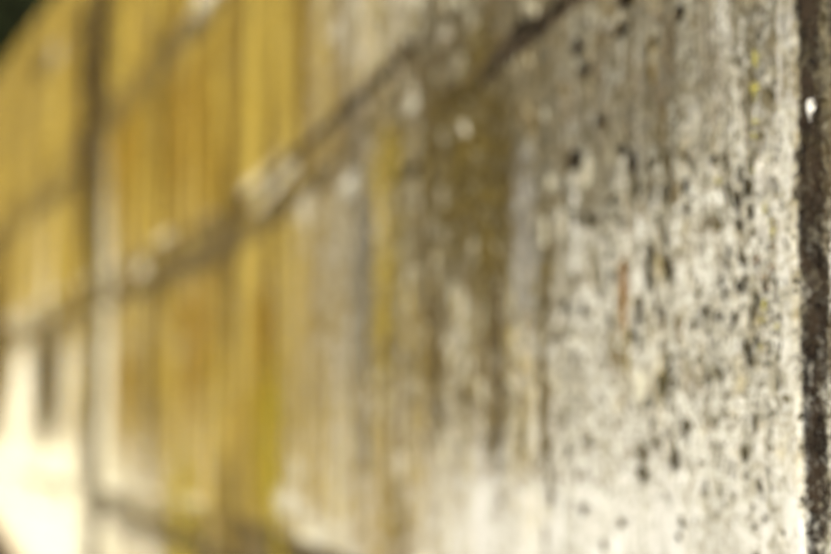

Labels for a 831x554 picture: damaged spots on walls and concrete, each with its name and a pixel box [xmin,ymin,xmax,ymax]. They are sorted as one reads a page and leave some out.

rust [619,256,629,393]
water stain [793,0,831,554]